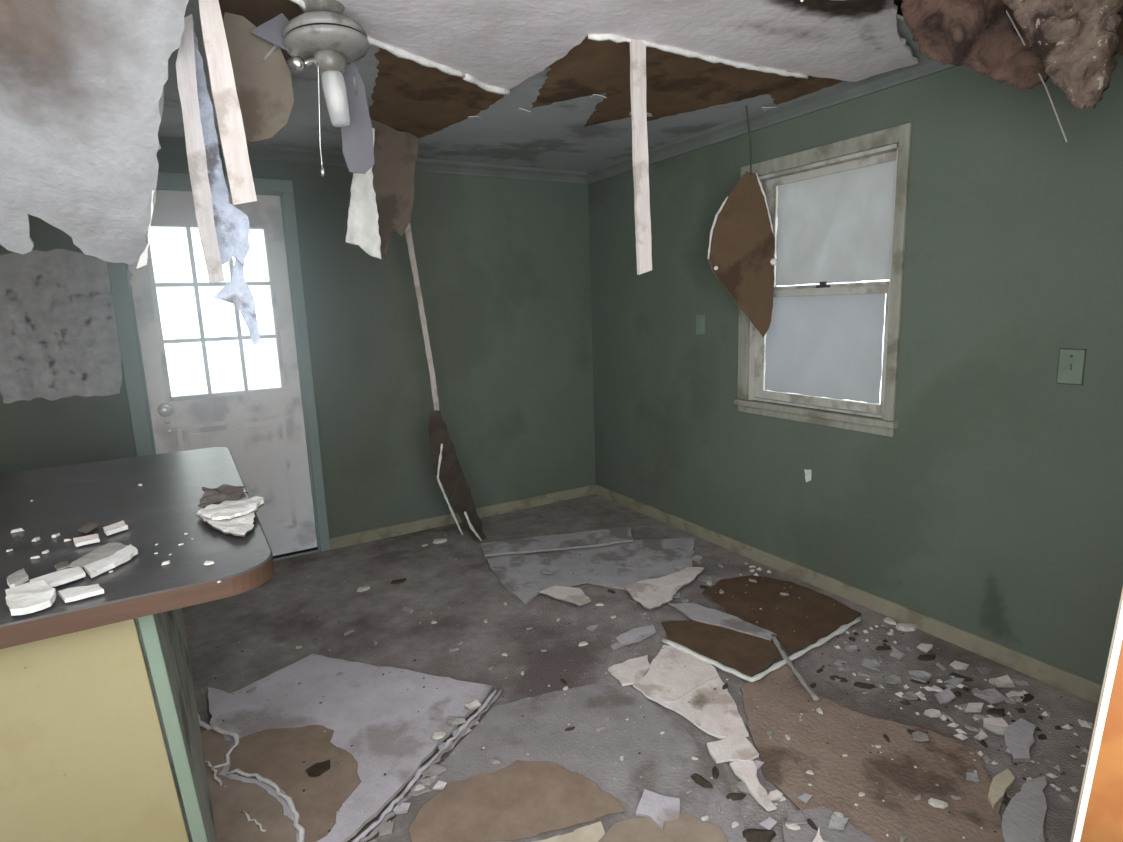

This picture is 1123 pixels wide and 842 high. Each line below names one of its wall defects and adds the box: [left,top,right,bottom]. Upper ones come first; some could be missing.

spalling [218,0,306,27]
damp [776,0,890,18]
spalling [367,36,511,138]
spalling [519,34,843,127]
spalling [707,196,728,259]
spalling [756,173,774,234]